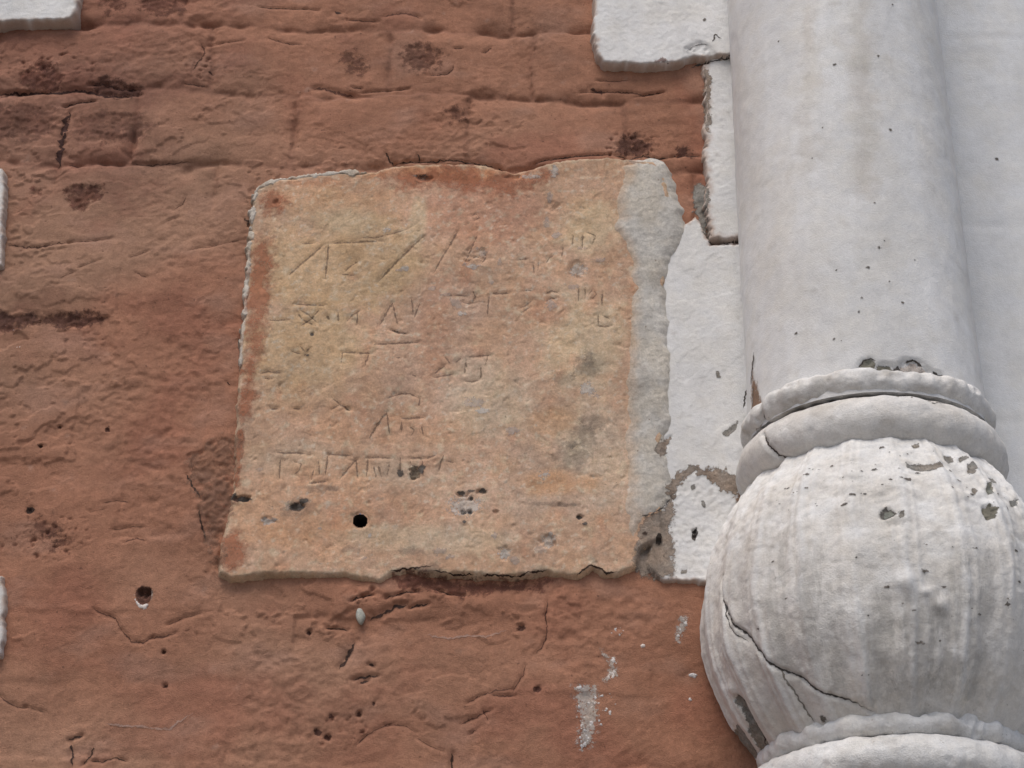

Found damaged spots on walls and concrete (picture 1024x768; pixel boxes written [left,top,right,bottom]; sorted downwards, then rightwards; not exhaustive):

flaking render [859,358,943,376]
peeling [654,437,672,457]
spalling [906,456,978,474]
spalling [972,479,1019,520]
spalling [632,465,738,581]
spalling [880,507,904,520]
crack [723,596,873,721]